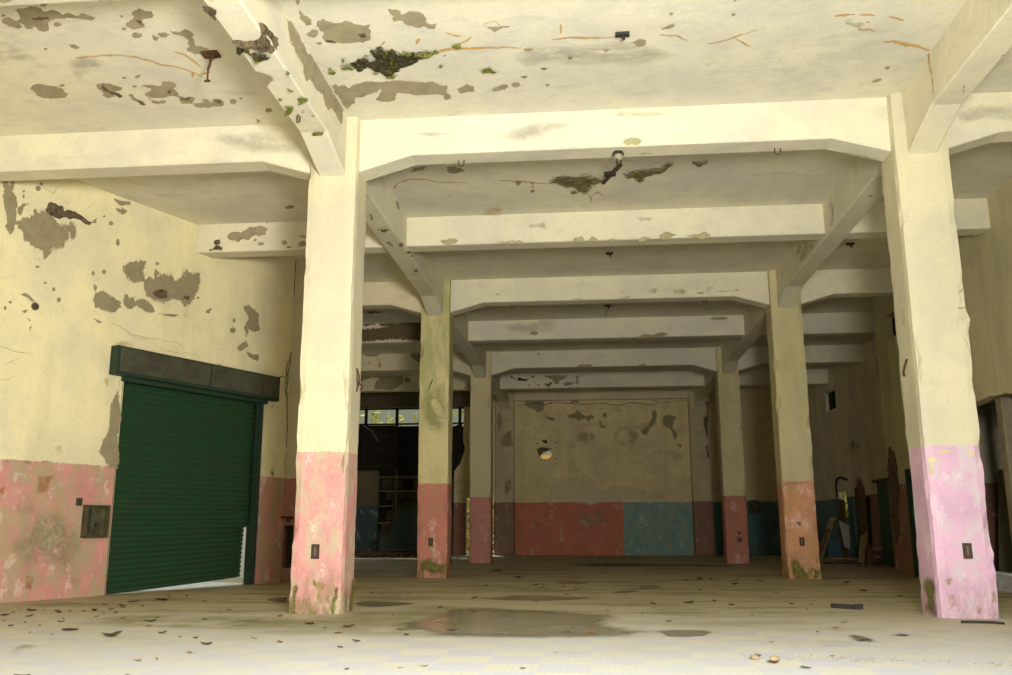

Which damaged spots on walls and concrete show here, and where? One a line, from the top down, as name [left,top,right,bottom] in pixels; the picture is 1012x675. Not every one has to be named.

peeling [231,0,475,124]
peeling [2,181,131,268]
peeling [92,259,200,323]
peeling [230,305,260,361]
peeling [99,391,122,470]
peeling [641,400,682,447]